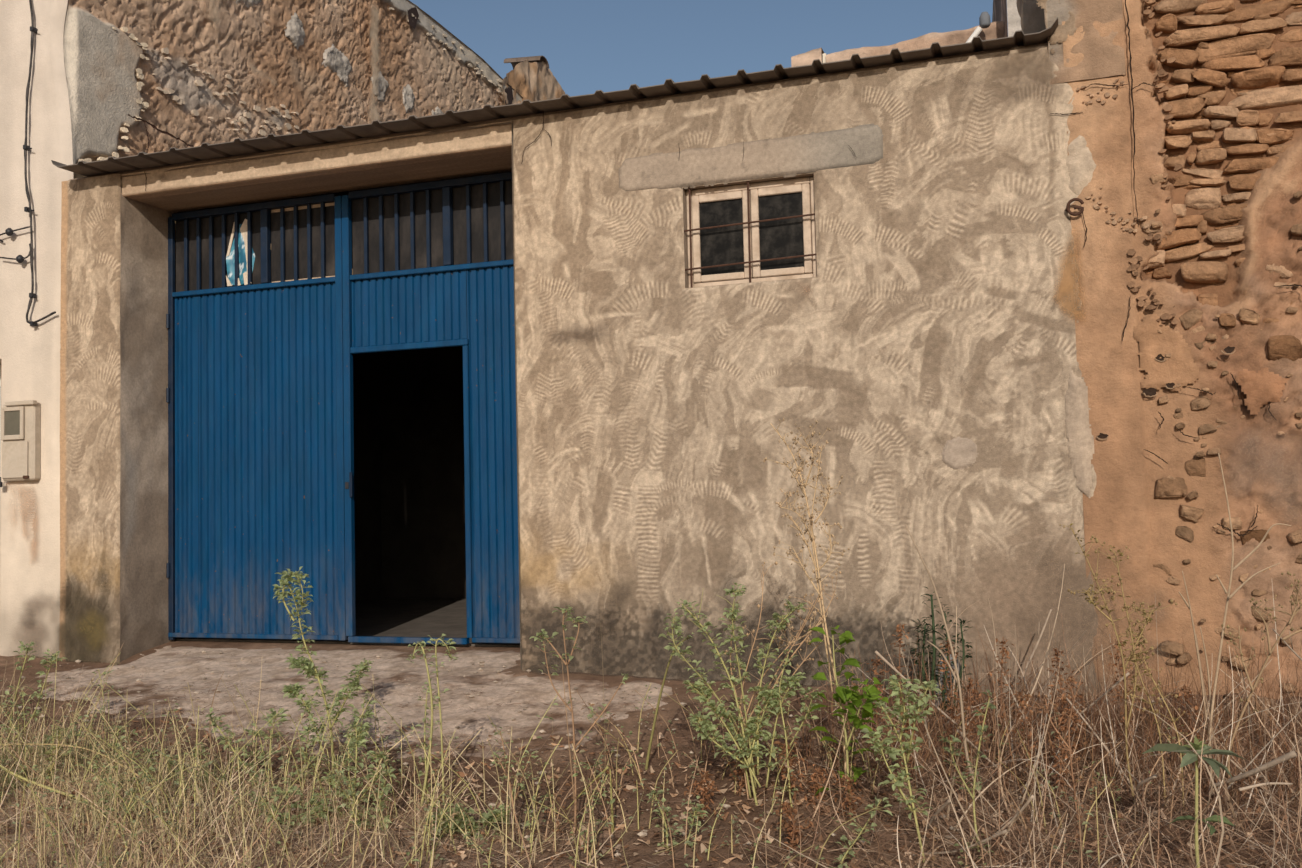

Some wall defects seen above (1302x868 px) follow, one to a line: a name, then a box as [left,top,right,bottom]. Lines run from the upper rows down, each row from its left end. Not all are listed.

peeling [1143,0,1176,124]
crack [1050,0,1157,226]
spalling [1086,187,1199,397]
spalling [1233,368,1290,415]
damp [25,590,106,663]
damp [530,622,573,674]
damp [590,615,894,687]